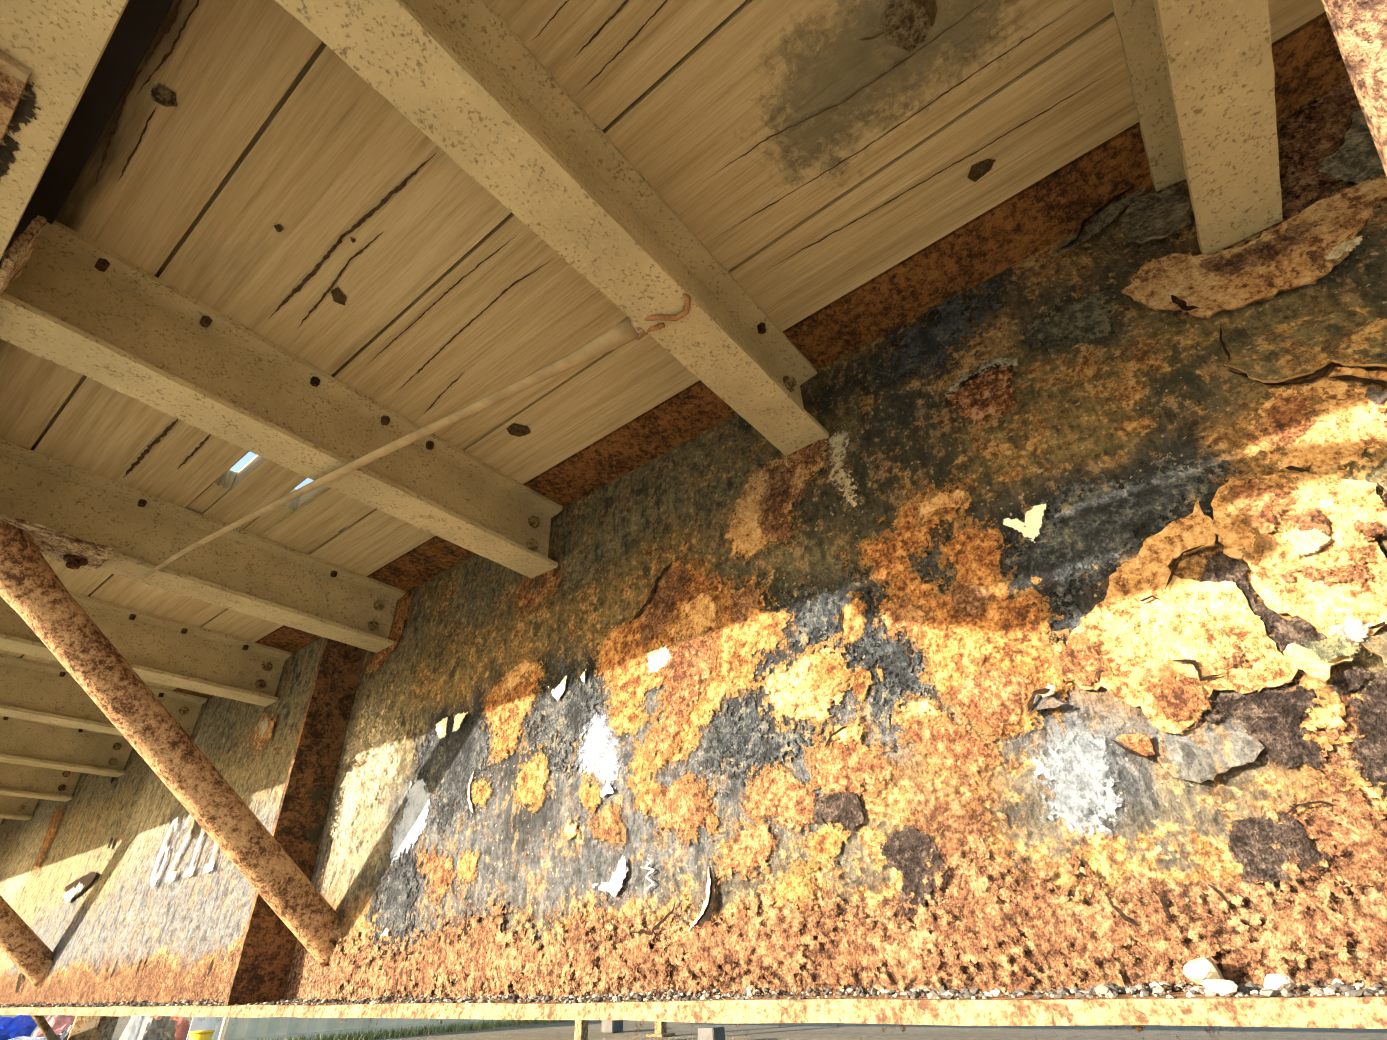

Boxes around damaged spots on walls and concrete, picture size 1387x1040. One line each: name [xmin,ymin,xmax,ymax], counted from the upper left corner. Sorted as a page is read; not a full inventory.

peeling [1053,186,1191,254]
peeling [1224,310,1387,383]
corrosion [944,355,1020,427]
corrosion [249,706,278,756]
peeling [436,712,468,739]
peeling [548,669,586,701]
corrosion [315,372,1387,1024]
peeling [1283,633,1387,683]
corrosion [31,802,67,875]
peeling [593,855,628,897]
peeling [688,867,711,931]